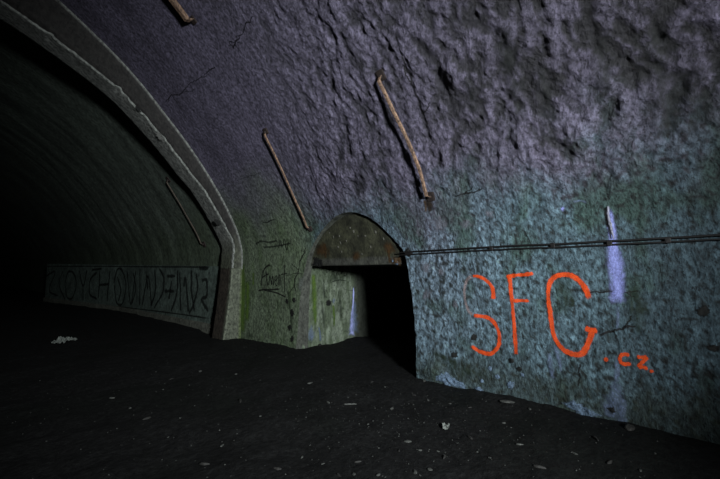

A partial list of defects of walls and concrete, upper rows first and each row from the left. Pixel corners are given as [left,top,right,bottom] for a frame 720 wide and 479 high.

corrosion [169,0,197,25]
crack [229,16,254,49]
corrosion [263,128,313,232]
corrosion [375,69,435,211]
leakage [608,212,624,299]
crack [601,316,636,341]